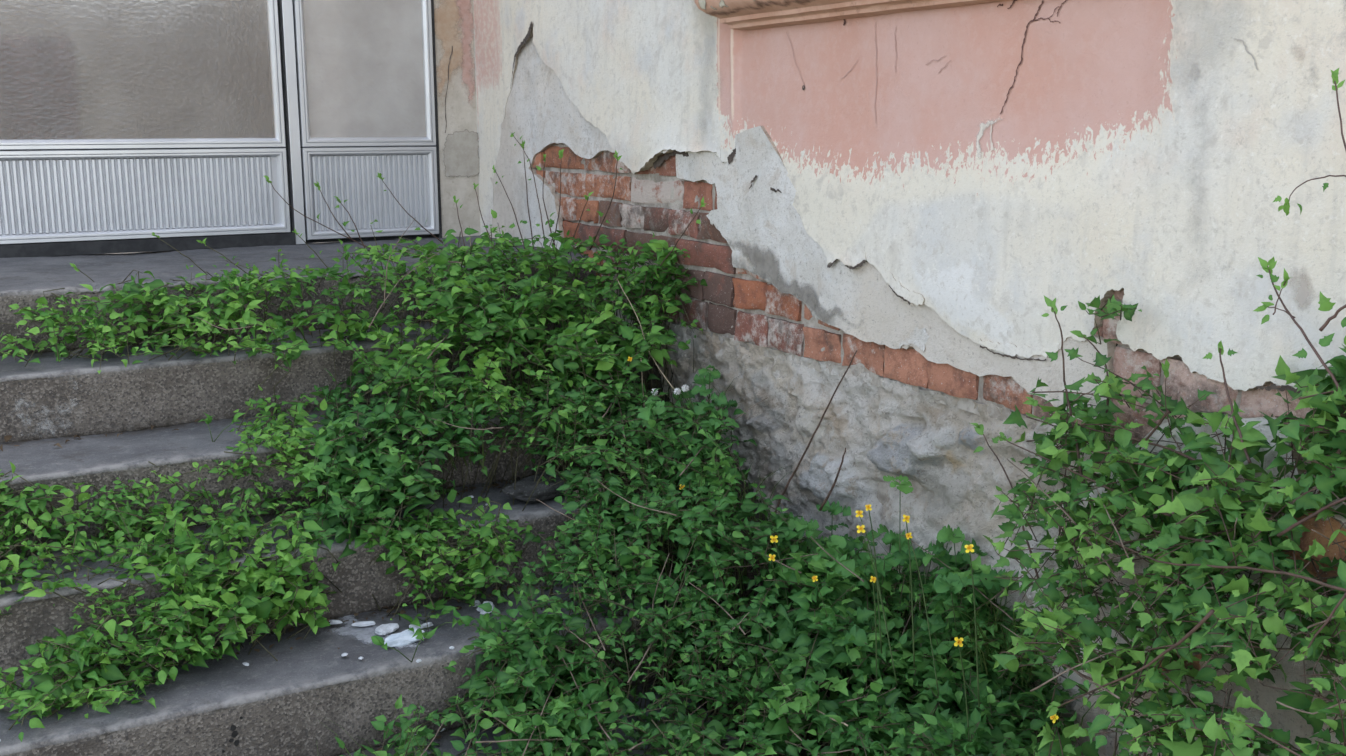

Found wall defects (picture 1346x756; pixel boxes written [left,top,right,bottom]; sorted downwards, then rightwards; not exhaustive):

crack [990,0,1066,151]
flaking render [489,37,1315,480]
spalling [1062,472,1124,508]